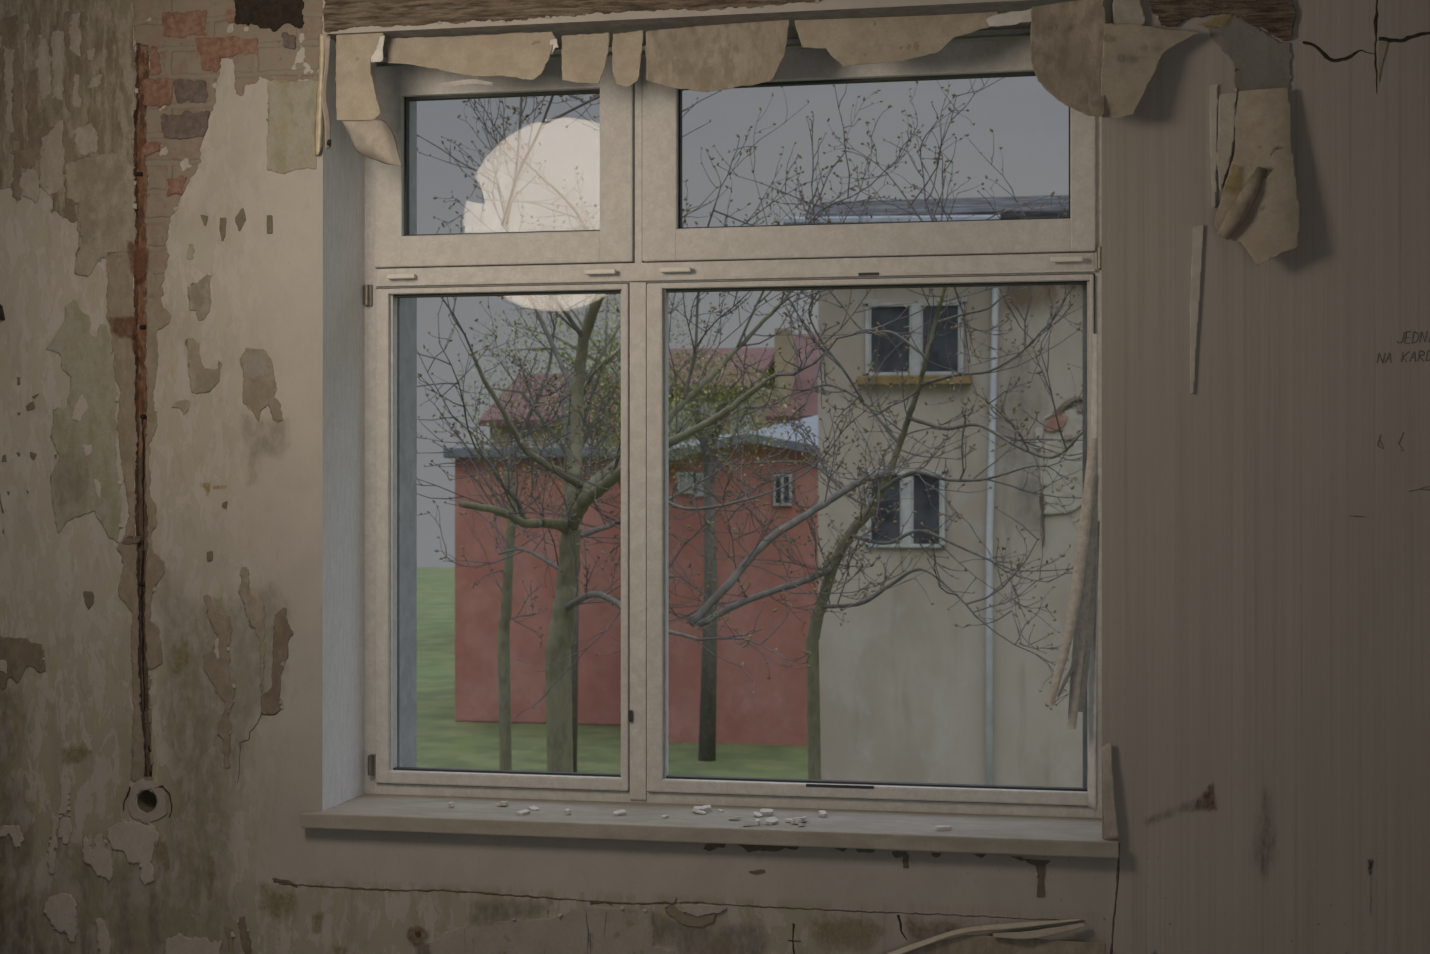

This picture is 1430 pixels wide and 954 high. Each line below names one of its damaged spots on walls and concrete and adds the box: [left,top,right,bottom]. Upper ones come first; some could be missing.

peeling [0,0,822,782]
crack [139,418,147,714]
peeling [0,825,24,849]
peeling [46,778,160,886]
peeling [43,893,78,942]
peeling [164,916,252,954]
peeling [420,904,727,954]